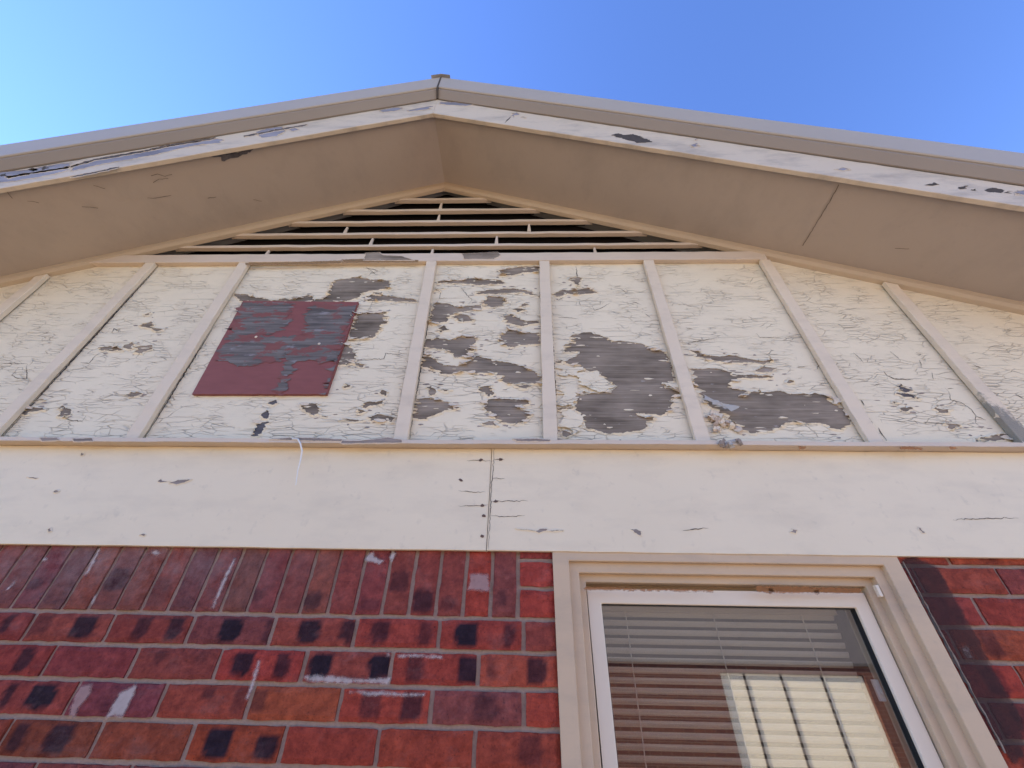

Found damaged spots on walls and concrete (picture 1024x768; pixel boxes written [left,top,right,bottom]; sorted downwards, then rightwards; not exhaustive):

peeling [0,124,308,183]
peeling [613,133,652,143]
crack [802,185,839,246]
peeling [958,186,1024,196]
crack [4,276,150,434]
crack [145,335,209,438]
peeling [213,275,418,445]
peeling [412,252,681,443]
peeling [684,344,853,438]
crack [855,354,985,441]
crack [460,459,526,546]